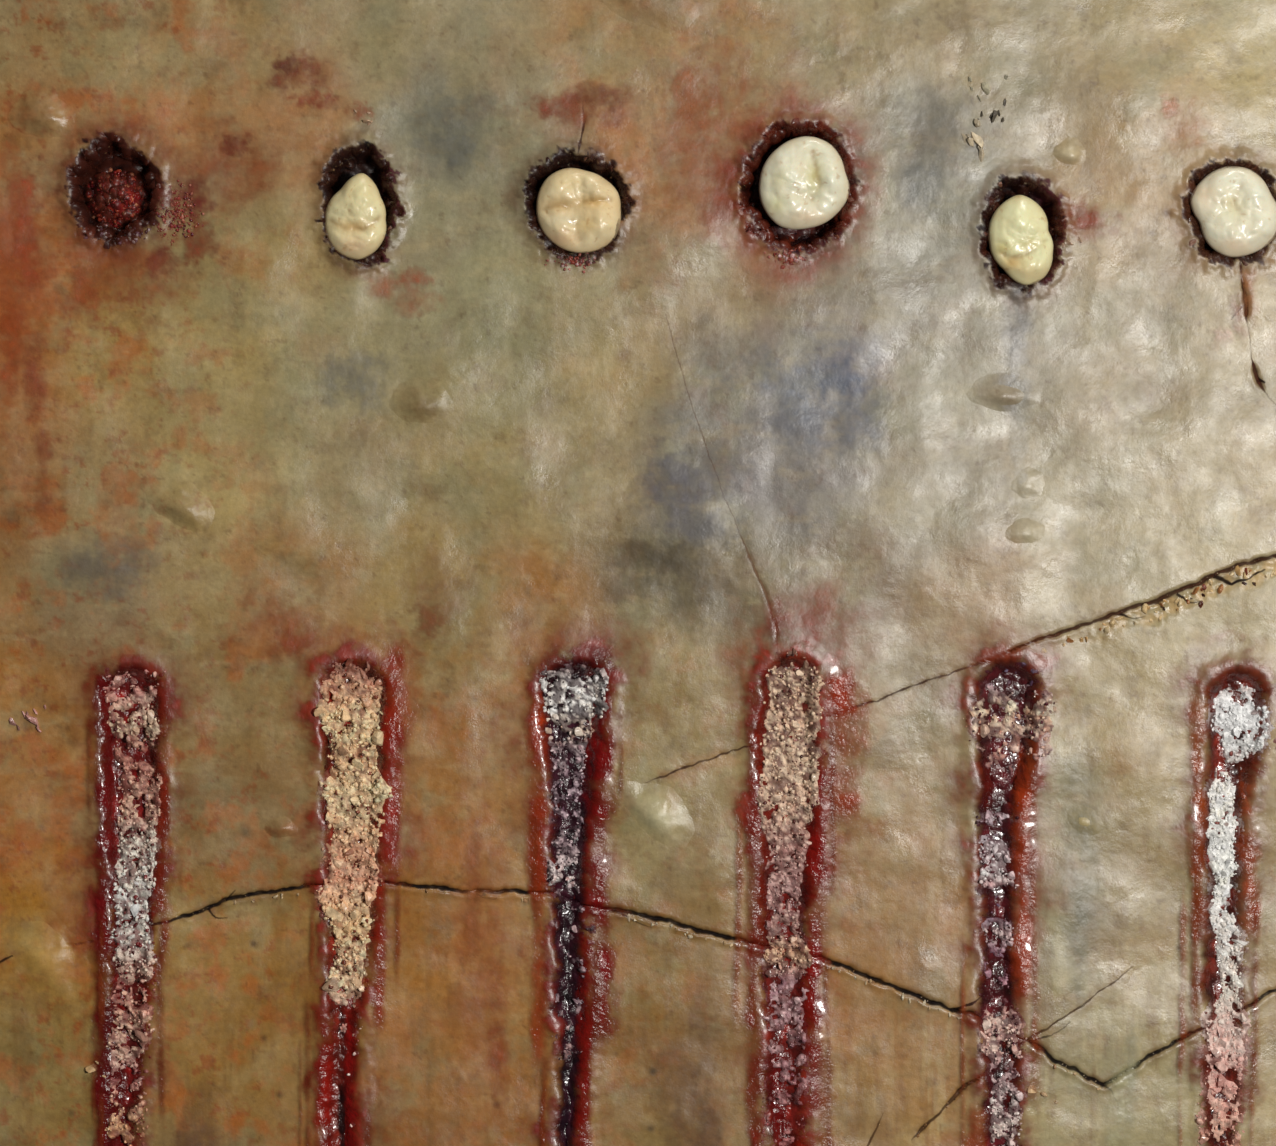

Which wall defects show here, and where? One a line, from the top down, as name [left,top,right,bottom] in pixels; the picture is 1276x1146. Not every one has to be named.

spalling [64,132,165,249]
rust [726,100,869,271]
crack [1012,554,1276,654]
rust [83,654,184,1146]
crack [152,883,316,925]
rust [297,640,415,1022]
rust [516,635,626,1146]
crack [604,907,764,948]
rust [735,638,860,1146]
crack [822,956,979,1020]
crack [1018,980,1203,1091]
rust [1175,658,1276,1003]